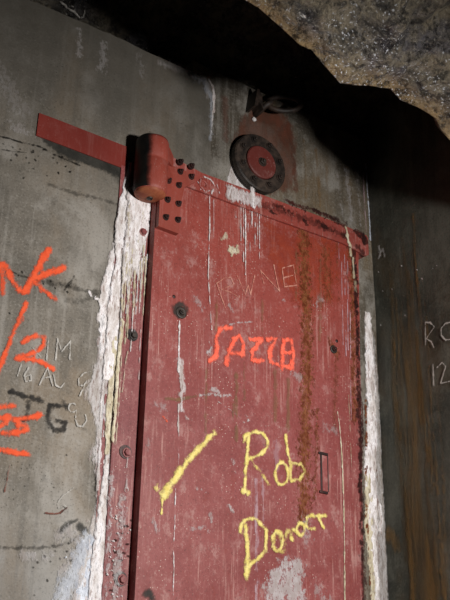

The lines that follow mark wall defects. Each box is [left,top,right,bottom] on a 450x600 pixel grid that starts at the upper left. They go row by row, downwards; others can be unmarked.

damp [42,138,151,600]
rust [293,229,320,530]
peeling [285,199,368,600]
damp [363,311,383,600]